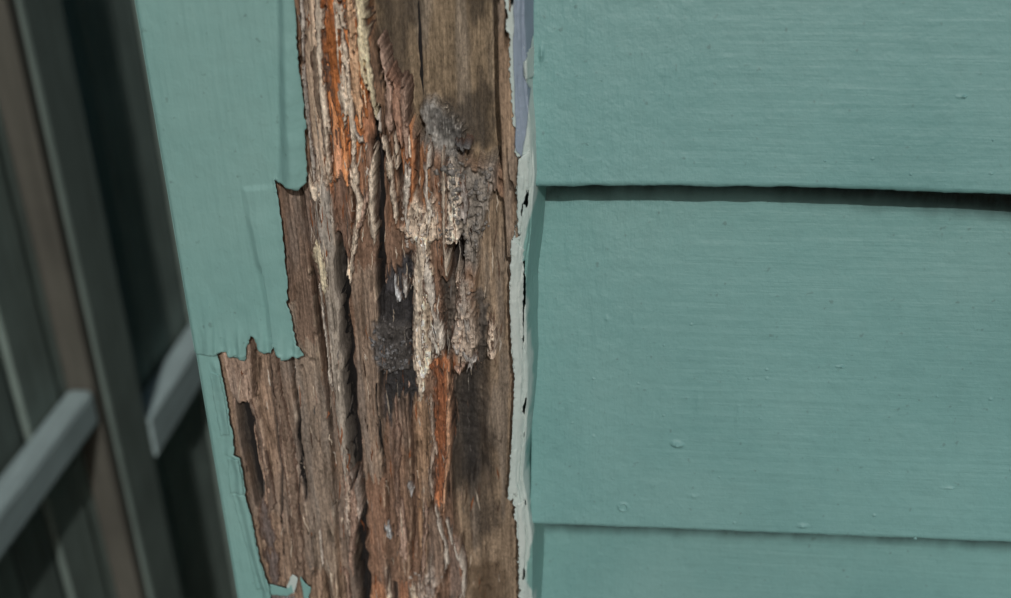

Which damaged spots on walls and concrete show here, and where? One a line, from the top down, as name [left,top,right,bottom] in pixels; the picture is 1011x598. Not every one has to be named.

crack [417,1,425,95]
peeling [224,0,308,361]
crack [375,119,387,280]
peeling [210,372,229,436]
crack [245,401,264,506]
crack [294,368,307,515]
crack [340,230,384,479]
peeling [507,0,534,589]
peeling [227,458,311,598]
crack [358,501,372,598]